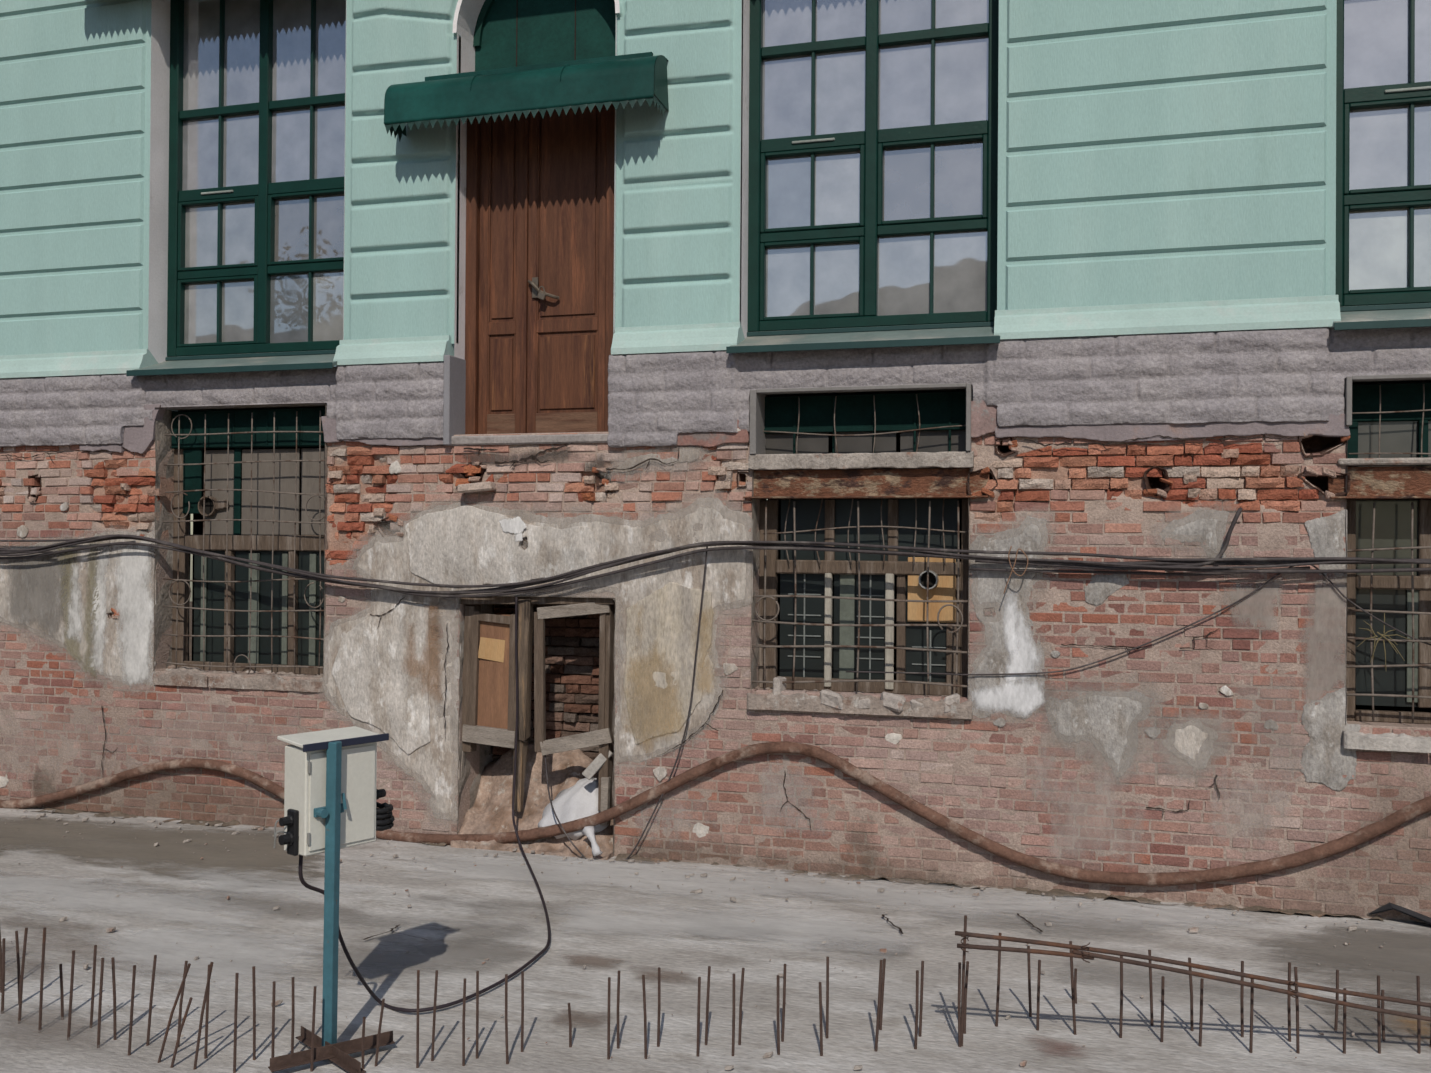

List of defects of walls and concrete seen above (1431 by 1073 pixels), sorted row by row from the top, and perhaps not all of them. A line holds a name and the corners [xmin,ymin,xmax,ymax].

peeling [0,459,166,688]
peeling [320,446,753,821]
spalling [820,689,924,713]
peeling [885,733,902,744]
leakage [972,595,1044,716]
spalling [943,433,1351,778]
peeling [1300,687,1361,791]
crack [780,771,811,829]